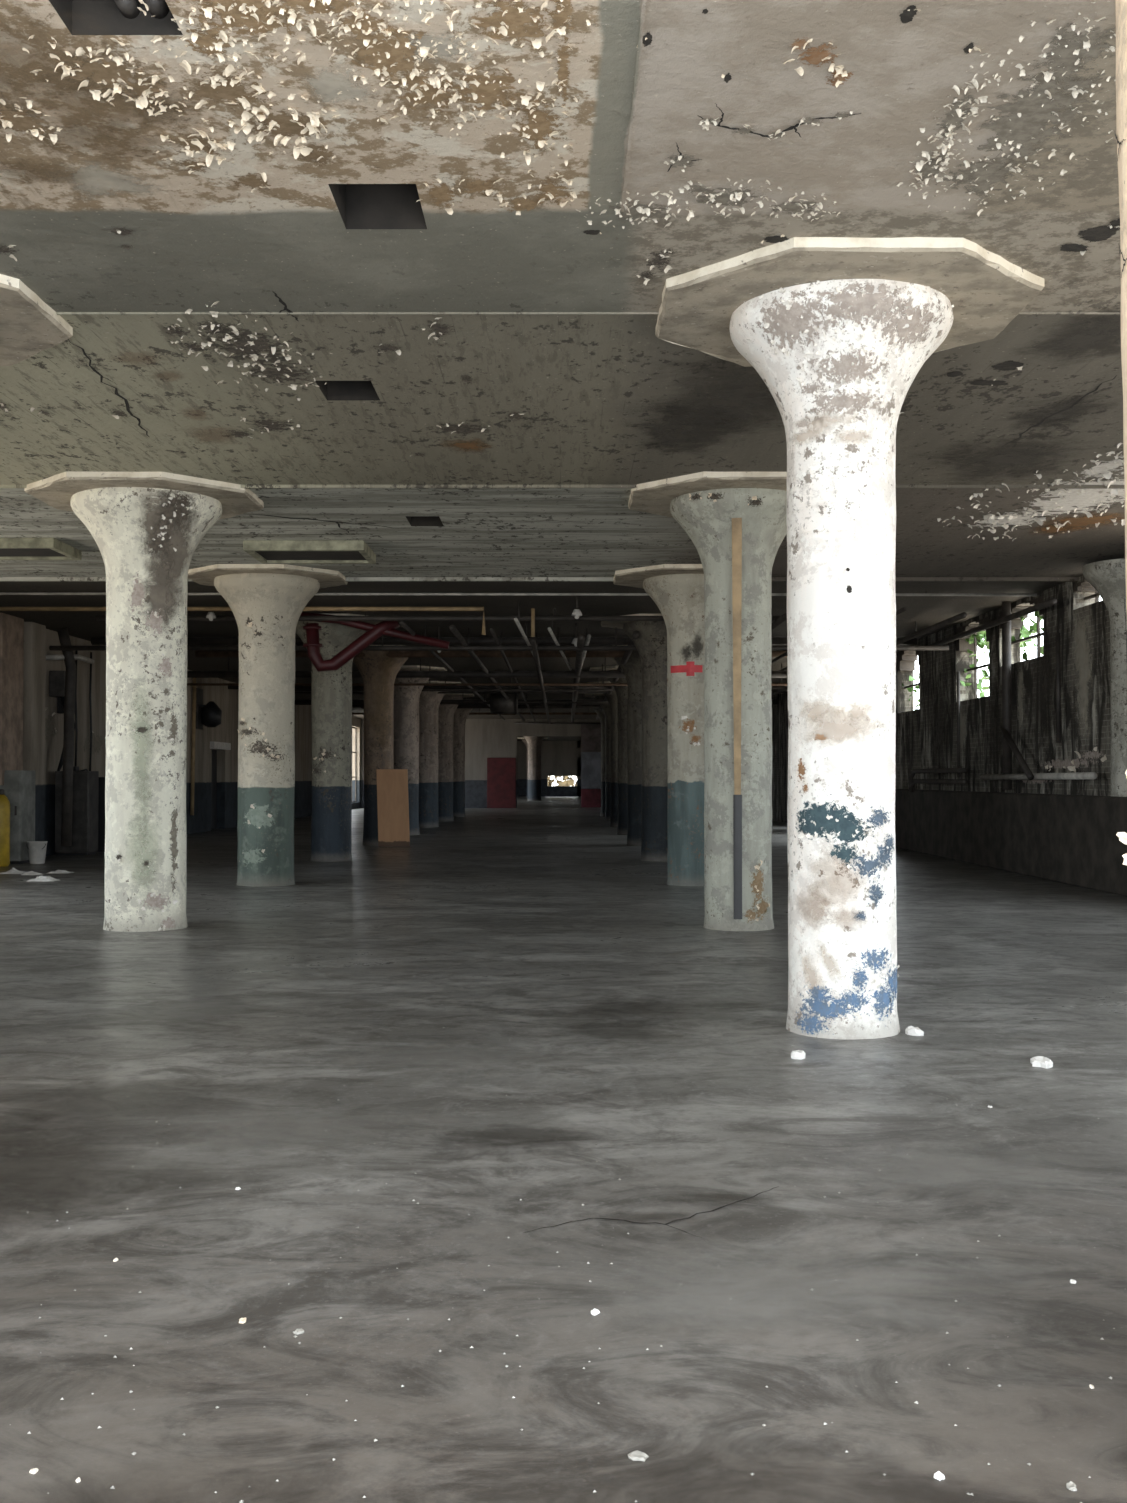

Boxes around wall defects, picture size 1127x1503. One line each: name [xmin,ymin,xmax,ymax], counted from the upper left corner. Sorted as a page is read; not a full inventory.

peeling [0,97,62,144]
peeling [22,0,854,243]
crack [667,103,862,172]
peeling [897,2,1116,217]
peeling [0,243,20,261]
peeling [636,248,674,285]
crack [68,339,149,437]
peeling [158,301,332,401]
peeling [937,443,1125,542]
peeling [795,758,895,922]
peeling [1116,832,1127,865]
peeling [794,948,900,1035]